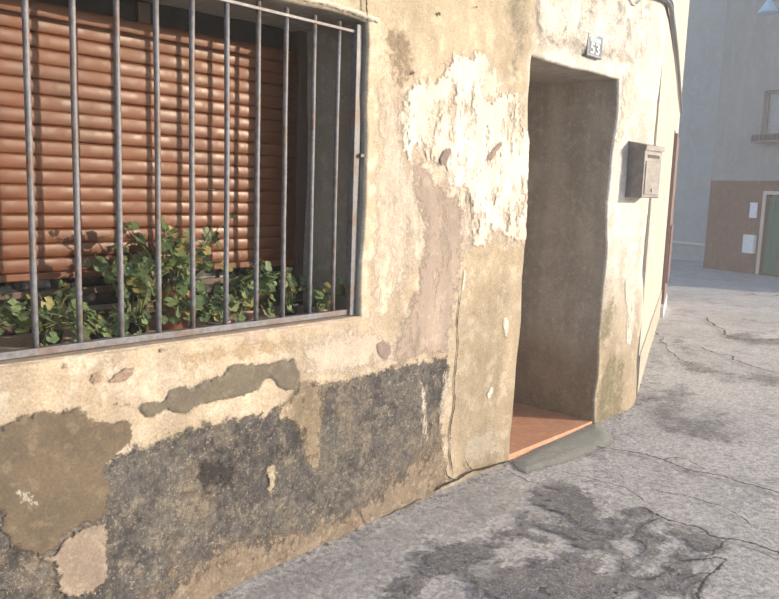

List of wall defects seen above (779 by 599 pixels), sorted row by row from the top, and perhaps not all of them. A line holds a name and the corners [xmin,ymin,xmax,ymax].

peeling [277,30,529,474]
crack [655,317,779,373]
leakage [419,386,428,441]
leakage [438,363,453,424]
crack [361,301,531,523]
peeling [15,490,38,505]
spalling [265,465,278,495]
crack [596,446,779,493]
spalling [44,520,110,598]
crack [566,472,779,599]